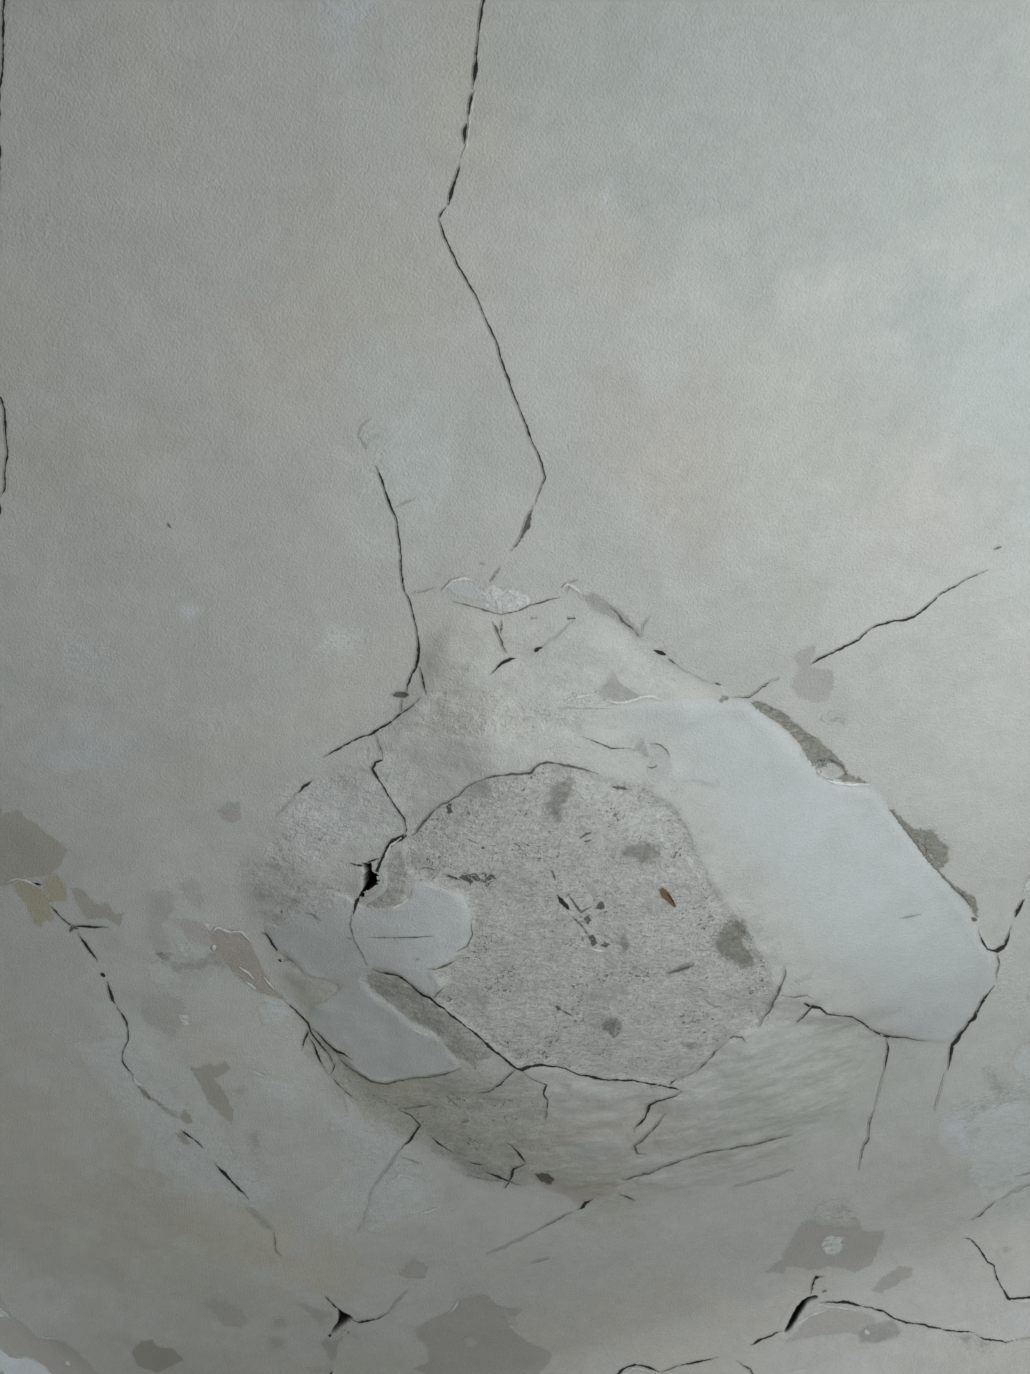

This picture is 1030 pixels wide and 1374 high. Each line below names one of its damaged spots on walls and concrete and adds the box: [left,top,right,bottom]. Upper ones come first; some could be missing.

crack [0,0,8,182]
crack [439,0,547,582]
spalling [412,577,651,640]
crack [277,419,1026,1265]
peeling [156,918,287,1001]
spalling [250,645,1002,1234]
crack [50,905,282,1256]
crack [963,1183,1030,1303]
peeling [0,1348,52,1374]
peeling [413,1293,552,1374]
crack [617,1330,783,1374]
crack [810,1275,1030,1344]